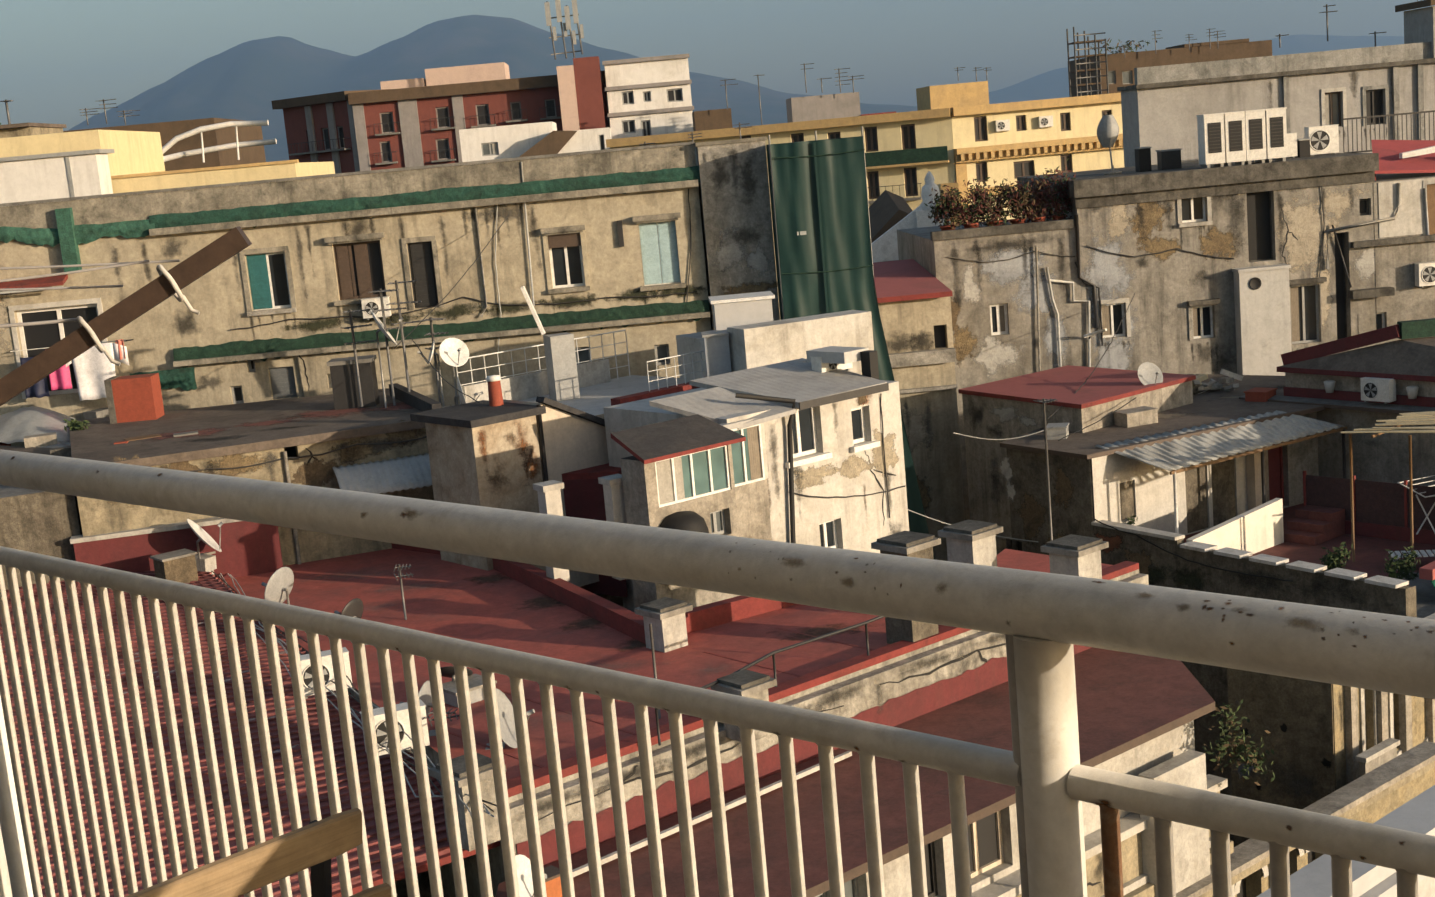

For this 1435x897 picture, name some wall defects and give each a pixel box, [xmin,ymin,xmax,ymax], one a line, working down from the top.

leakage [713,152,755,204]
flaking render [1198,226,1239,262]
peeling [1081,201,1182,370]
rust [478,430,487,461]
rust [507,424,540,478]
rust [1279,607,1367,647]